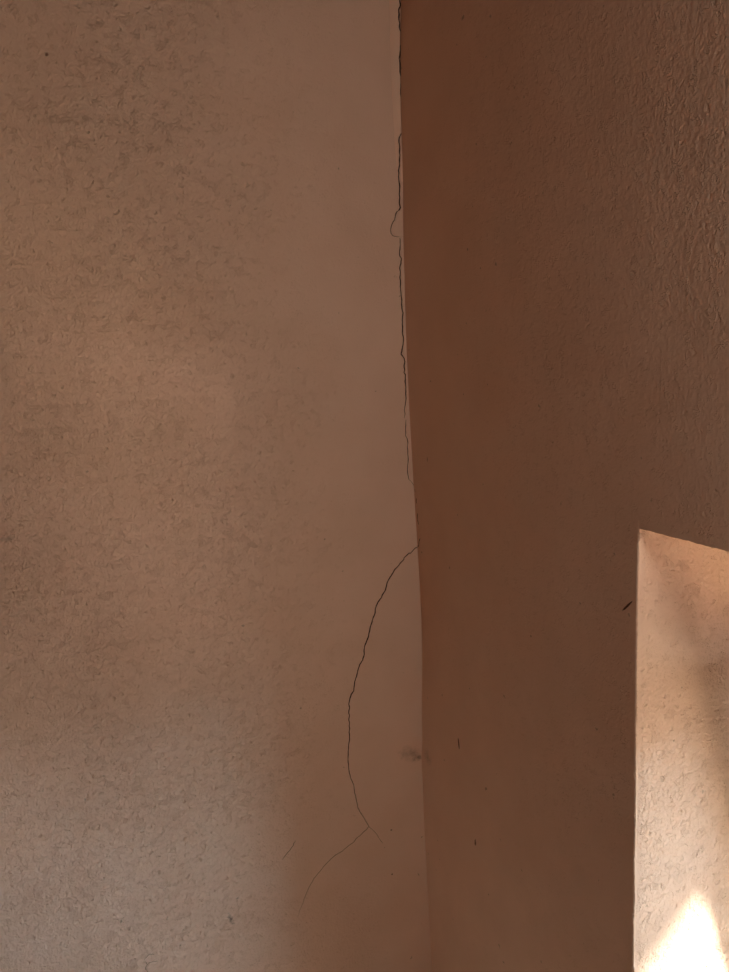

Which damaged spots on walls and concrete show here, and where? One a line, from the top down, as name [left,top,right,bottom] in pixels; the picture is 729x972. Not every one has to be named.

crack [395,0,403,95]
crack [299,127,420,911]